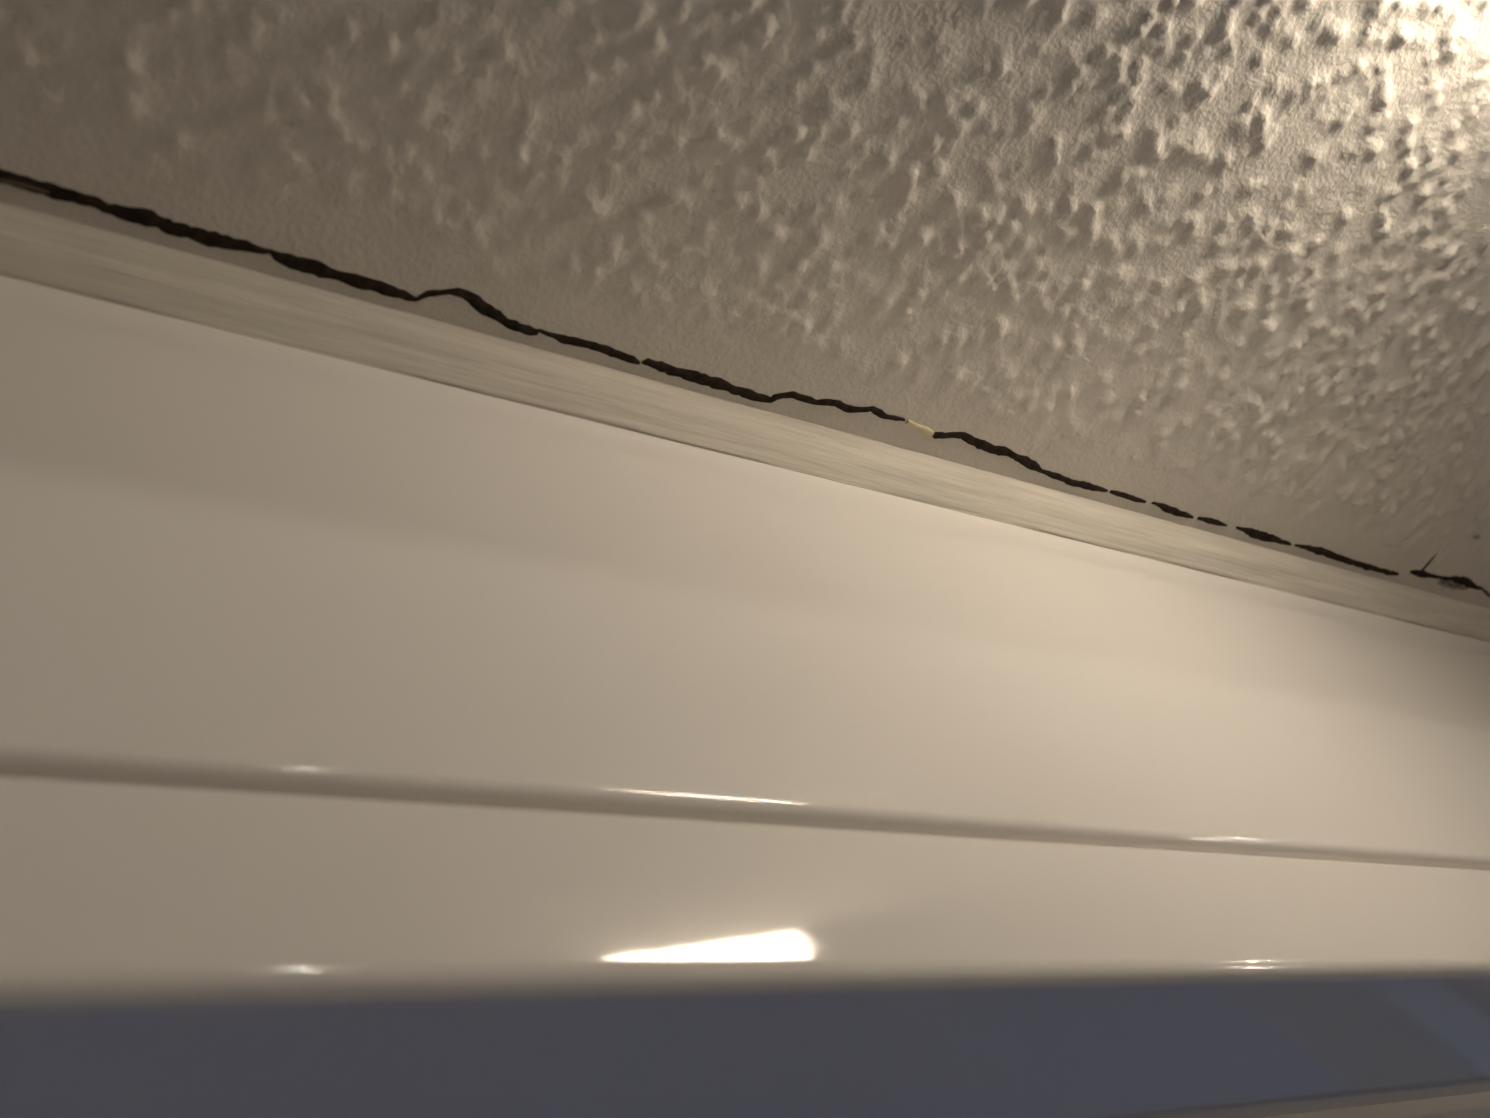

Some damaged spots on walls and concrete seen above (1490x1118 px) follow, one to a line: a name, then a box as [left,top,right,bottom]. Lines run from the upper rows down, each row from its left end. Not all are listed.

crack [0,168,1490,597]